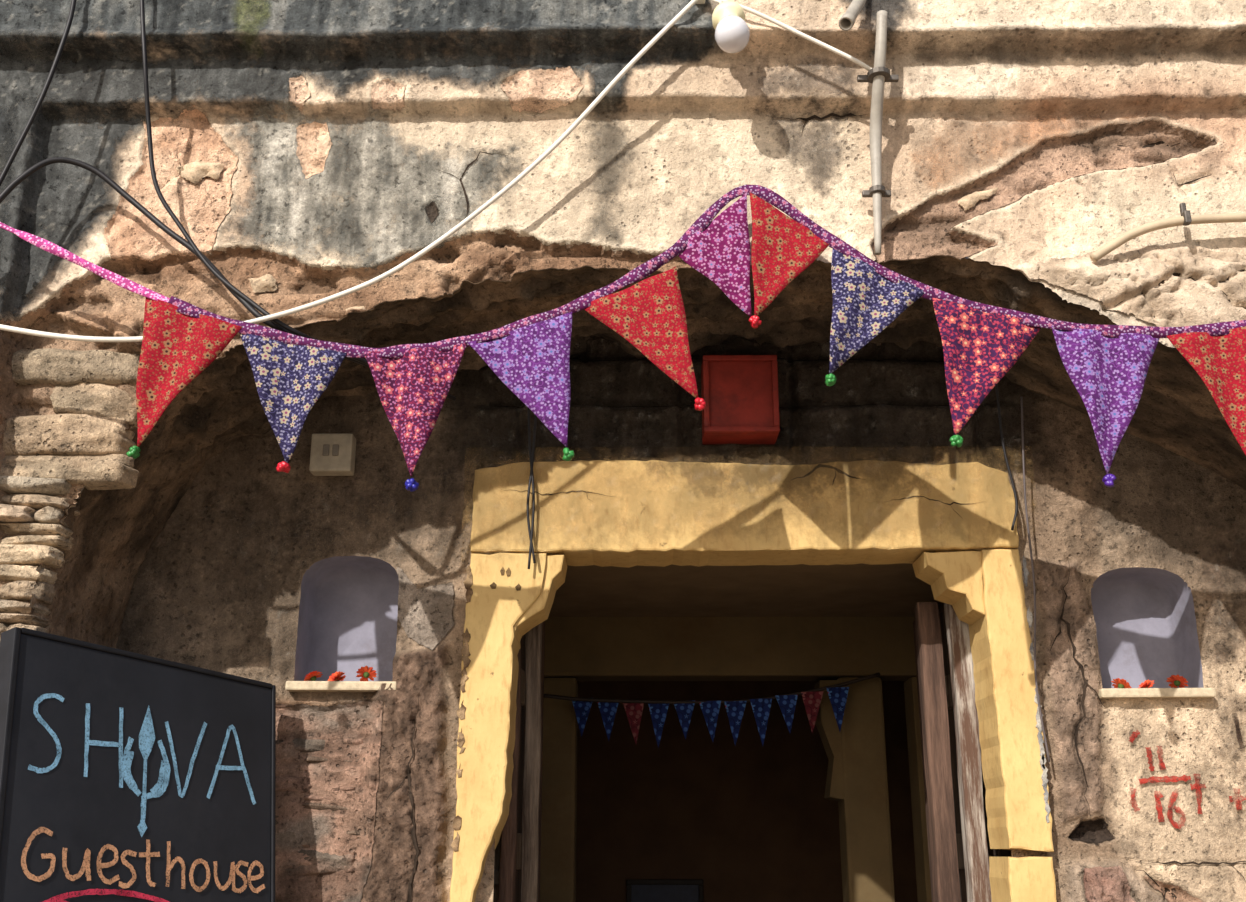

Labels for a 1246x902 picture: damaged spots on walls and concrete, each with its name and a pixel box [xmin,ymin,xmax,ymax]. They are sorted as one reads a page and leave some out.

water stain [0,0,722,320]
water stain [761,59,852,188]
flaking render [872,120,1217,263]
flaking render [0,105,692,637]
crack [387,696,419,902]
flaking render [396,566,473,777]
peeling [451,816,462,852]
peeling [1034,688,1050,823]
crack [1050,561,1105,814]
flaking render [1069,819,1114,845]
flaking render [1083,865,1136,902]
flaking render [1144,876,1203,902]